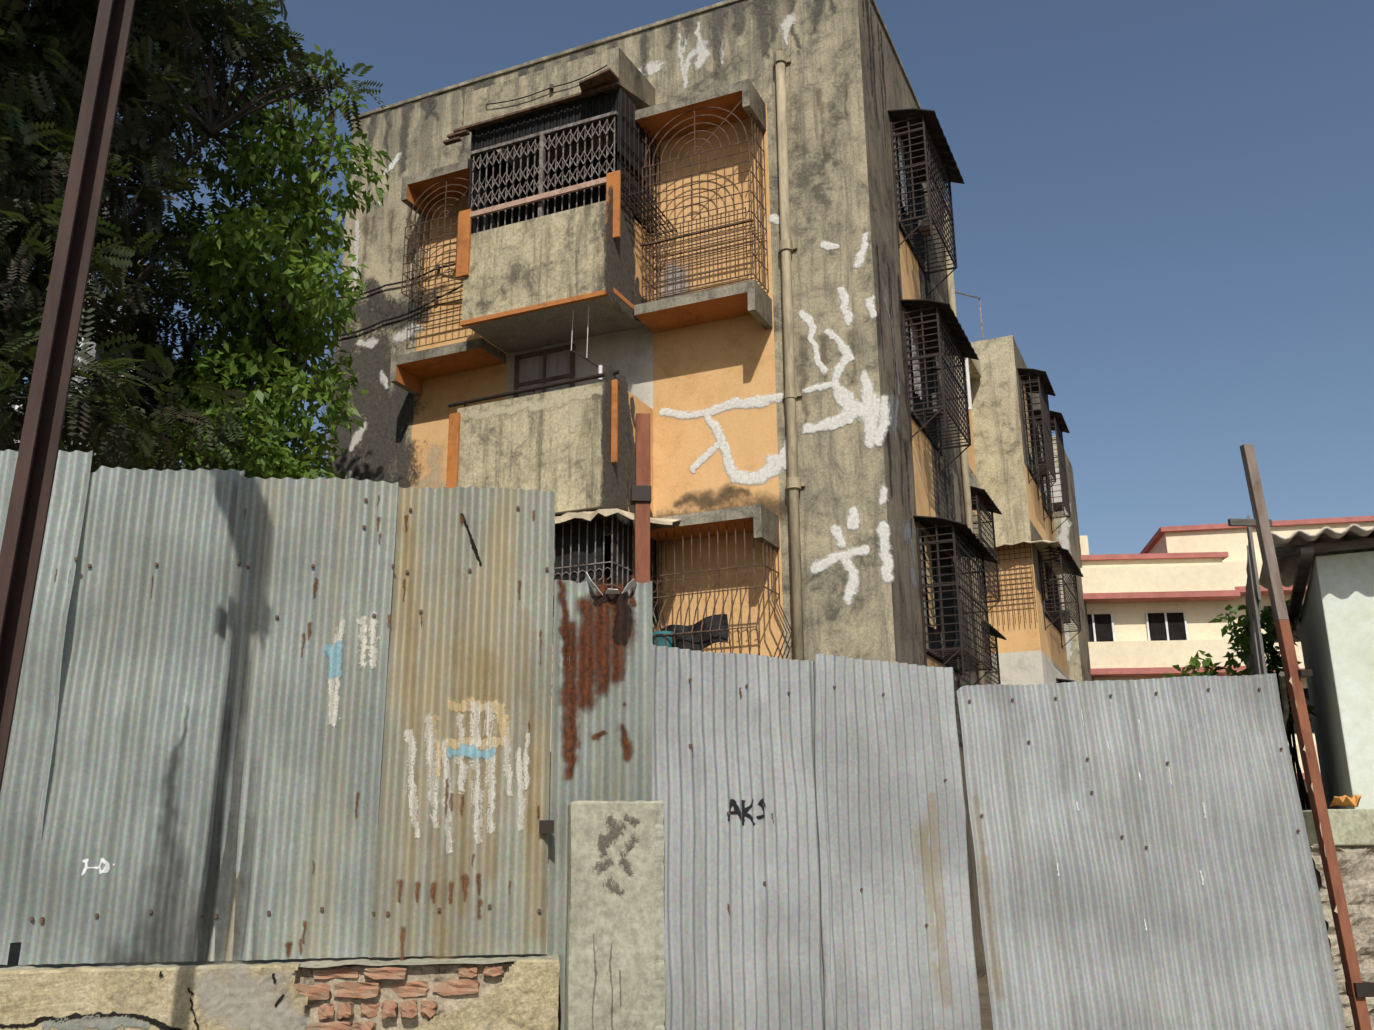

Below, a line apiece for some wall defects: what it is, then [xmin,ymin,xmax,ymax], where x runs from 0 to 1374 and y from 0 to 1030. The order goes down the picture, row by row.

leakage [519,62,544,77]
leakage [638,0,836,88]
leakage [863,0,886,148]
leakage [367,96,439,172]
leakage [460,77,495,153]
leakage [322,219,445,488]
leakage [876,245,917,589]
rust [558,575,636,779]
crack [0,971,199,1030]
crack [272,973,285,1007]
spalling [285,964,512,1030]